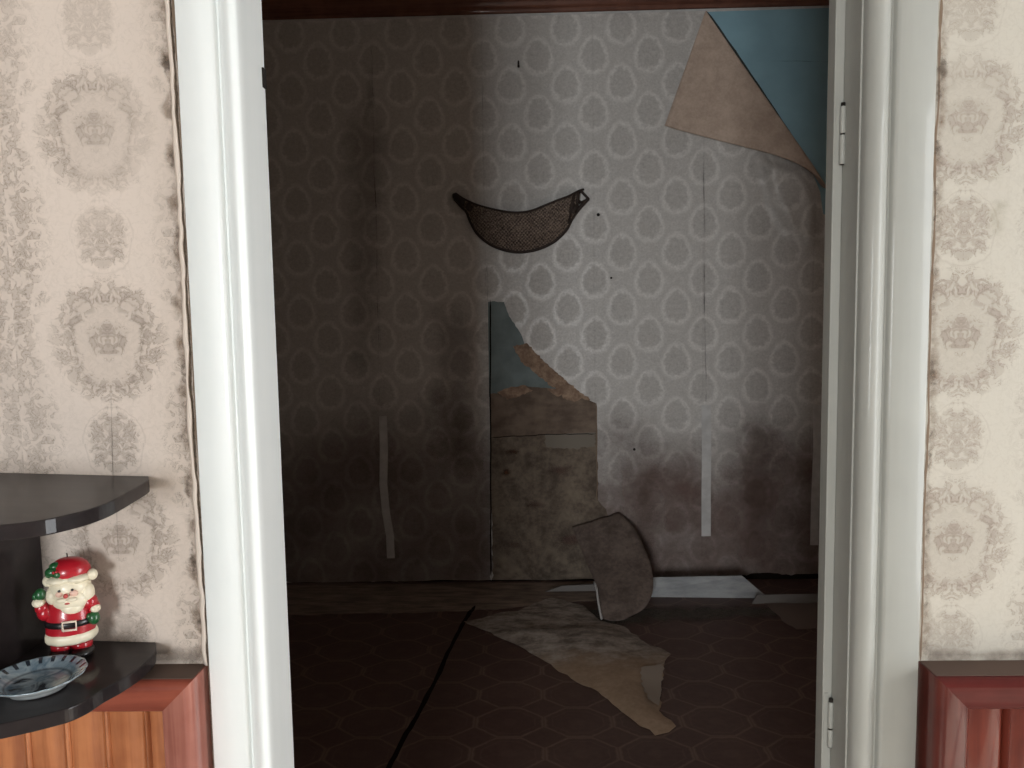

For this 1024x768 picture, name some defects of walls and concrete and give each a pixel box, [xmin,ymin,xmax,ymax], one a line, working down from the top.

peeling [513,343,590,402]
leakage [599,455,820,577]